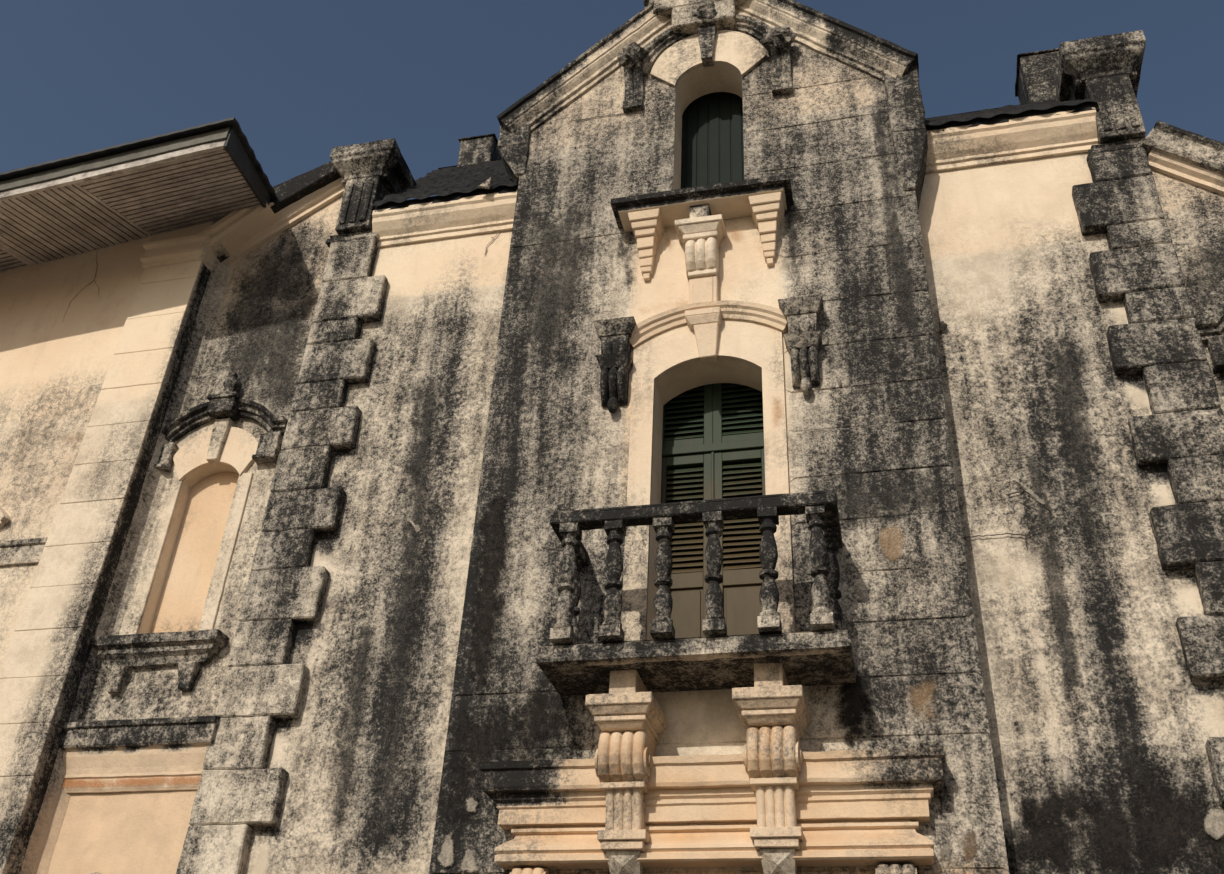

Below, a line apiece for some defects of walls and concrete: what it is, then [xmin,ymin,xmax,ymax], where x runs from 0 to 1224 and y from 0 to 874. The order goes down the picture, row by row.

water stain [643,27,692,76]
water stain [724,14,771,56]
water stain [224,231,322,436]
water stain [629,300,788,349]
water stain [161,399,214,443]
water stain [1027,454,1080,697]
water stain [331,377,440,867]
water stain [835,670,874,746]
water stain [1005,655,1224,874]
water stain [494,825,610,870]
water stain [636,822,763,868]
water stain [792,819,934,867]